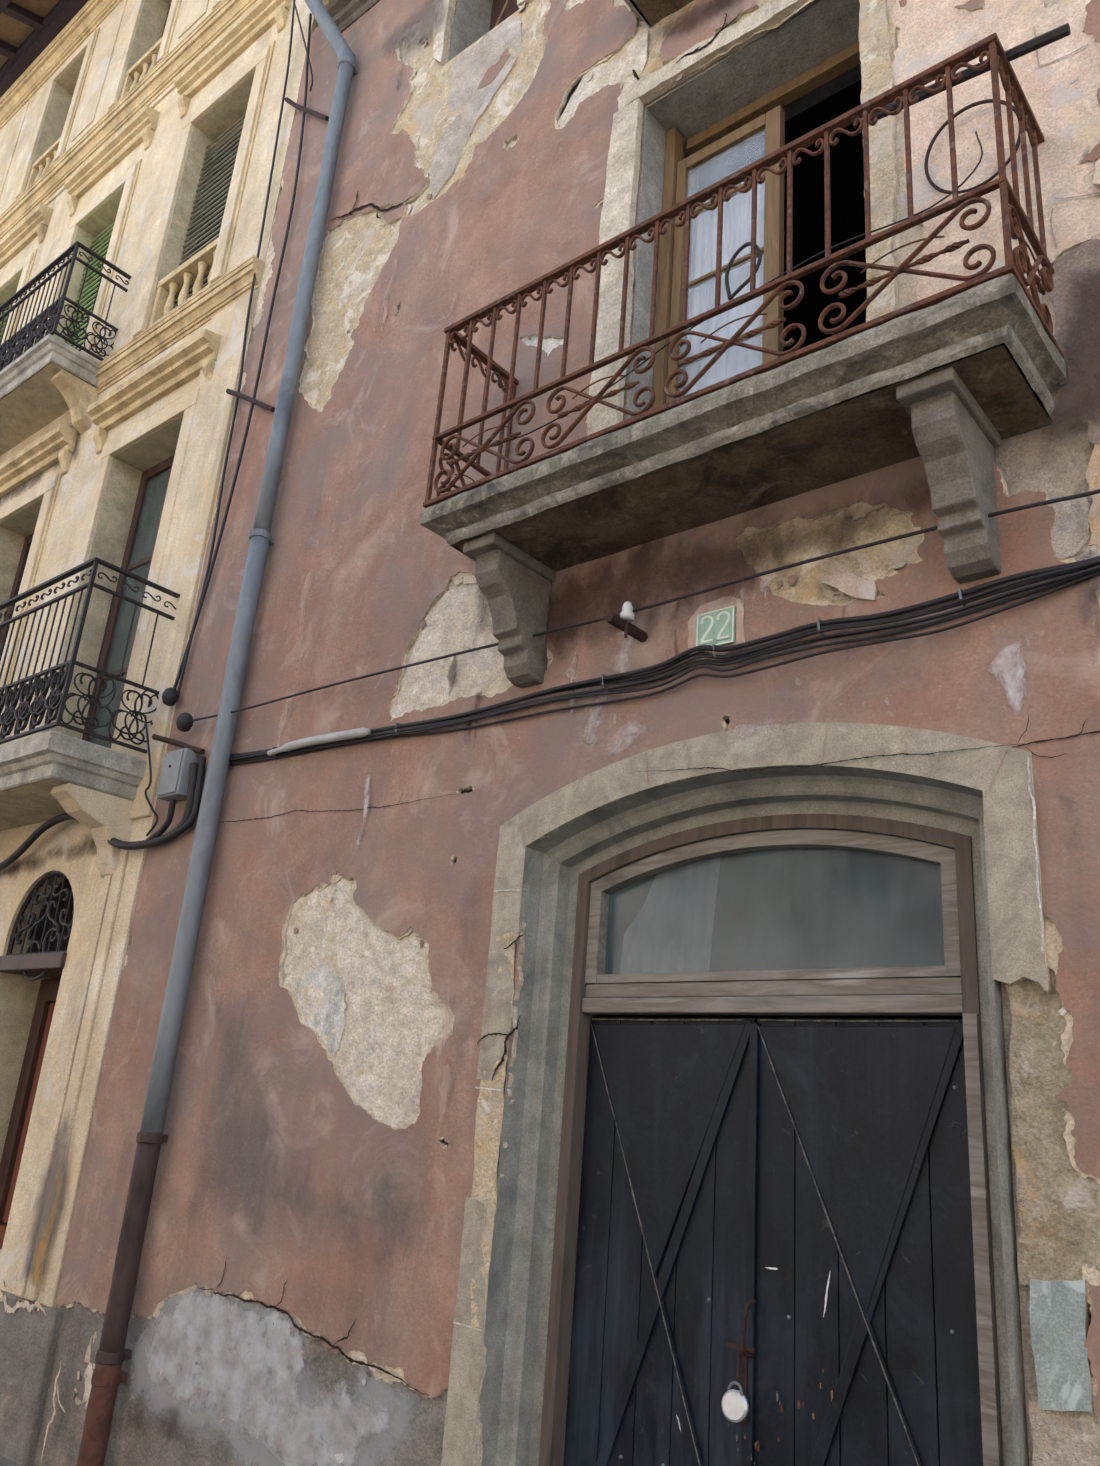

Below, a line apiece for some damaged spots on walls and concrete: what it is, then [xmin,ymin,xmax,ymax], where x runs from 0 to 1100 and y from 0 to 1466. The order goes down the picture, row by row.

peeling [557,0,813,128]
spalling [886,0,906,62]
peeling [303,0,584,409]
spalling [893,111,924,310]
spalling [1029,282,1066,363]
peeling [736,506,922,605]
peeling [391,577,506,721]
crack [639,716,1100,773]
peeling [283,878,454,1128]
spalling [1005,968,1100,1285]
peeling [145,1286,397,1466]
spalling [1029,1400,1100,1466]